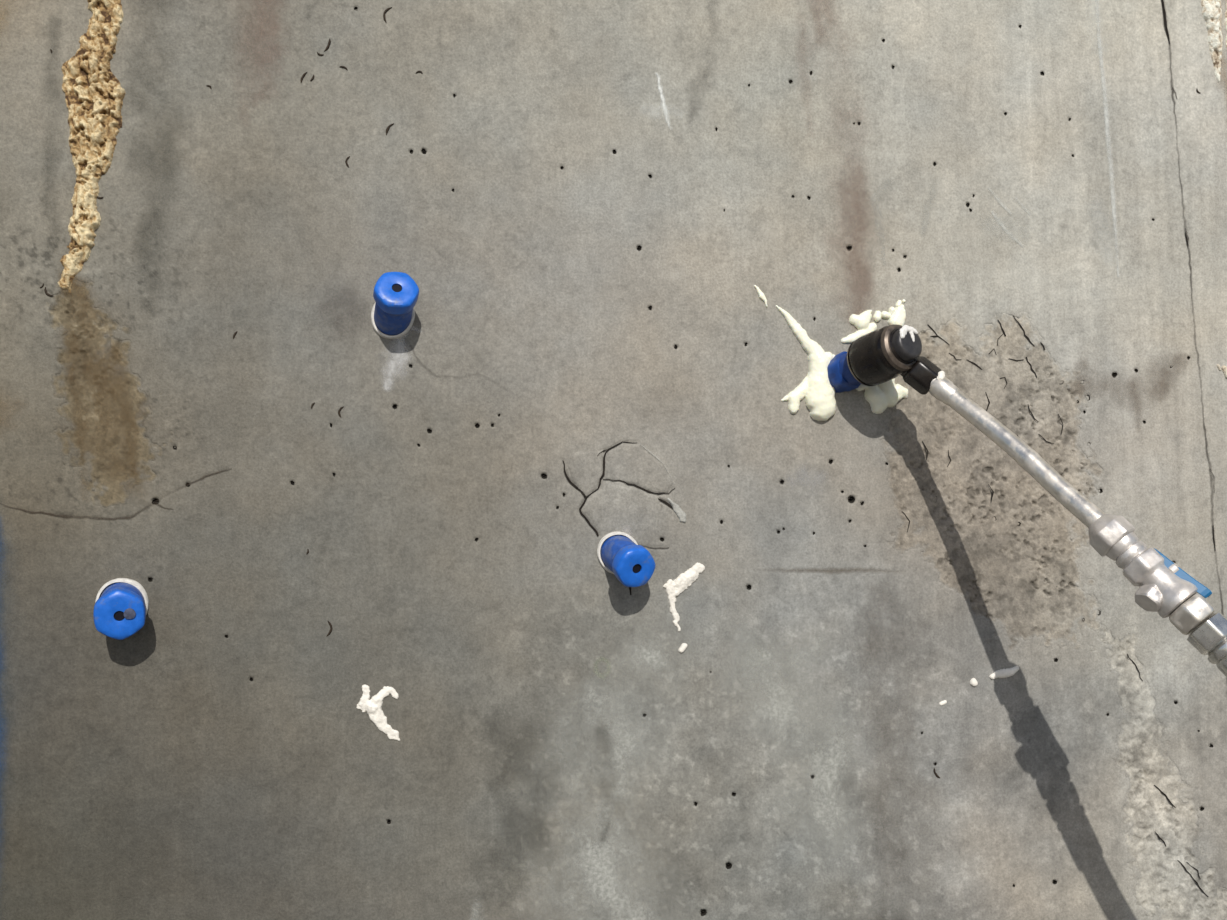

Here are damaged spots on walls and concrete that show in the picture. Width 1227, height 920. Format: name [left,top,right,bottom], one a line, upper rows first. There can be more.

crack [1162,0,1177,117]
spalling [919,310,1103,500]
crack [14,503,168,520]
crack [563,441,686,549]
spalling [879,375,1227,920]